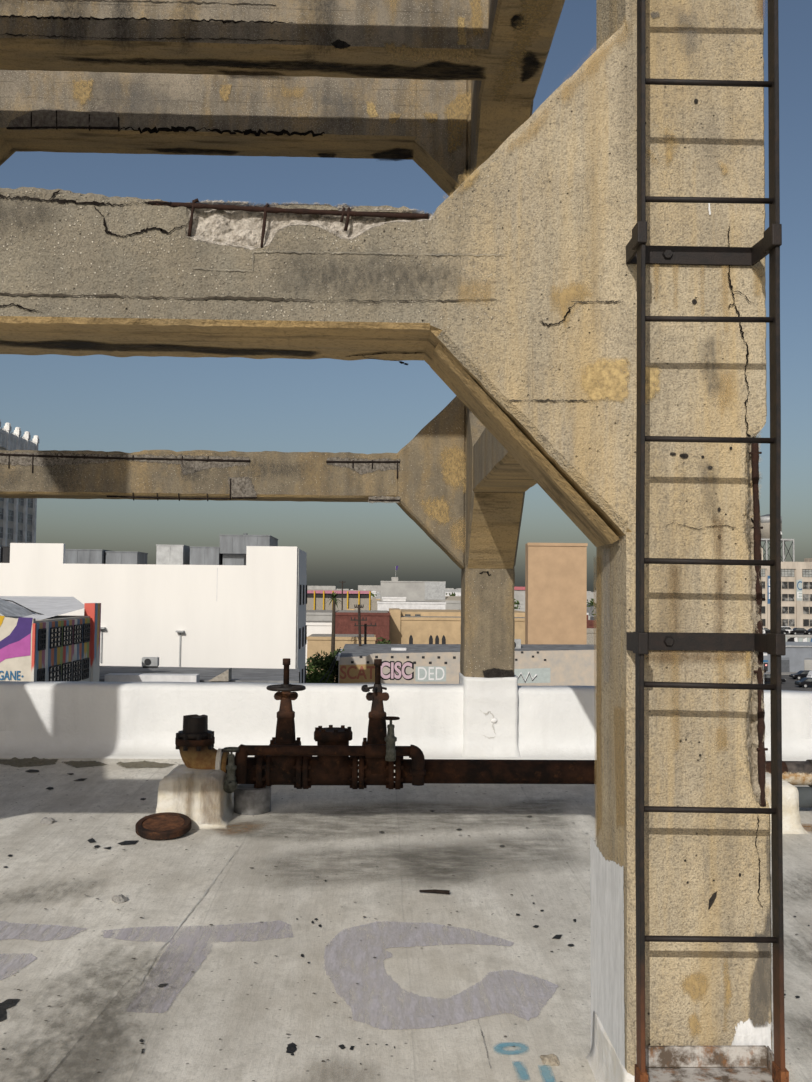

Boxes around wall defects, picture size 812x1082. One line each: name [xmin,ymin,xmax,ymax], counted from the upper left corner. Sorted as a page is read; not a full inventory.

leakage [72,0,484,81]
spalling [6,79,120,132]
crack [119,126,324,137]
peeling [424,89,471,153]
crack [0,190,185,237]
spalling [148,198,435,250]
crack [540,304,575,326]
crack [727,226,754,438]